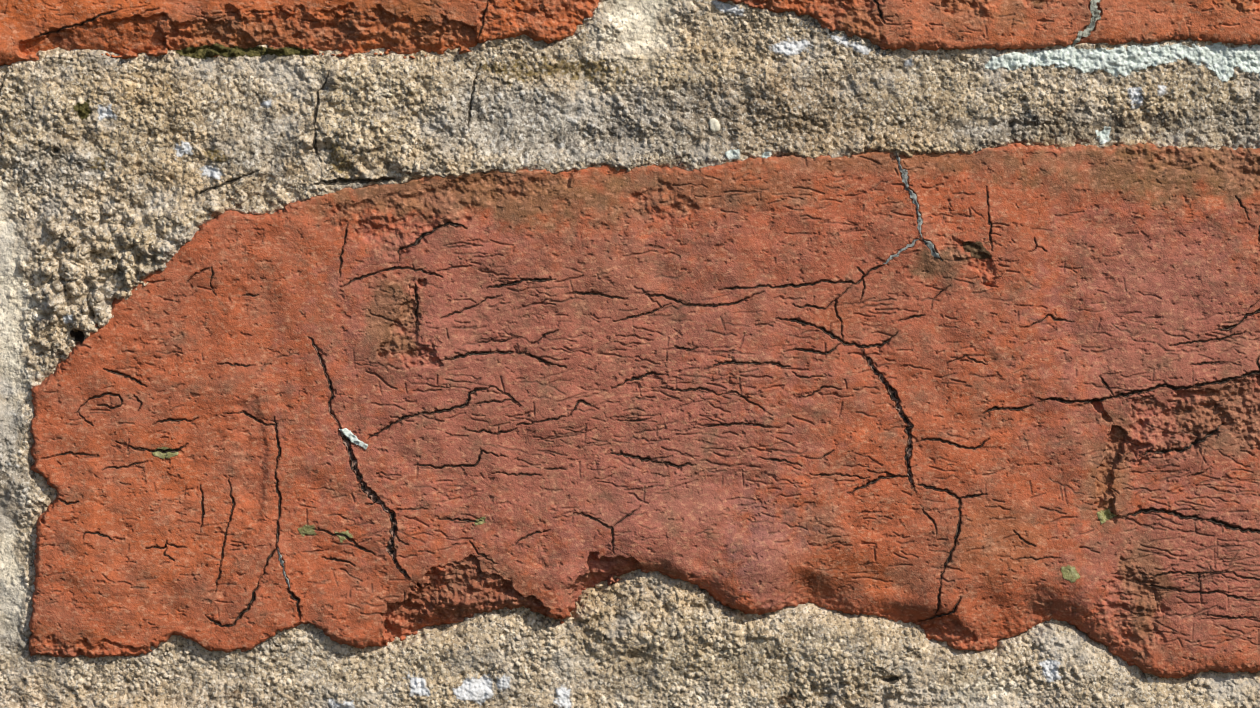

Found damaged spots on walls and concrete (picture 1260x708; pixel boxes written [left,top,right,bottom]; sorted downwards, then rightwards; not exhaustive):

crack [1071,0,1101,46]
leakage [985,42,1260,82]
crack [195,170,259,195]
crack [48,369,197,470]
crack [310,151,1260,622]
spalling [1093,375,1260,526]
crack [200,479,234,584]
crack [206,412,300,627]